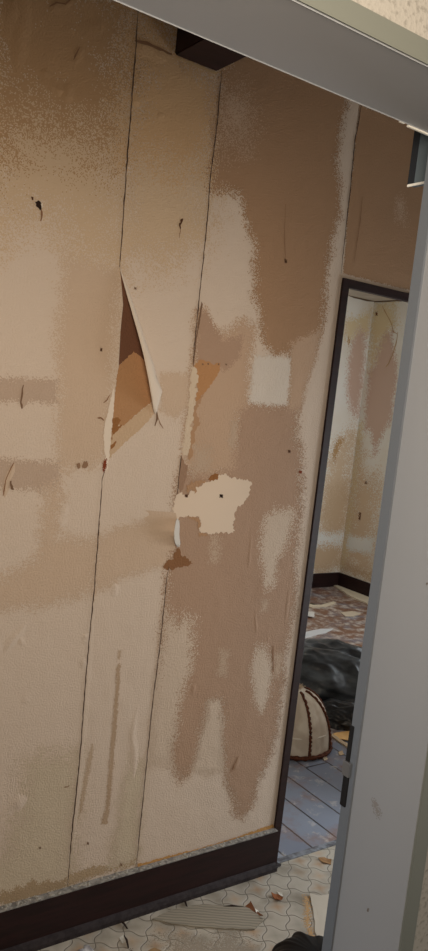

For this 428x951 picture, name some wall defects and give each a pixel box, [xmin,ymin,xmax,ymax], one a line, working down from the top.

peeling [103,267,162,470]
peeling [163,359,252,570]